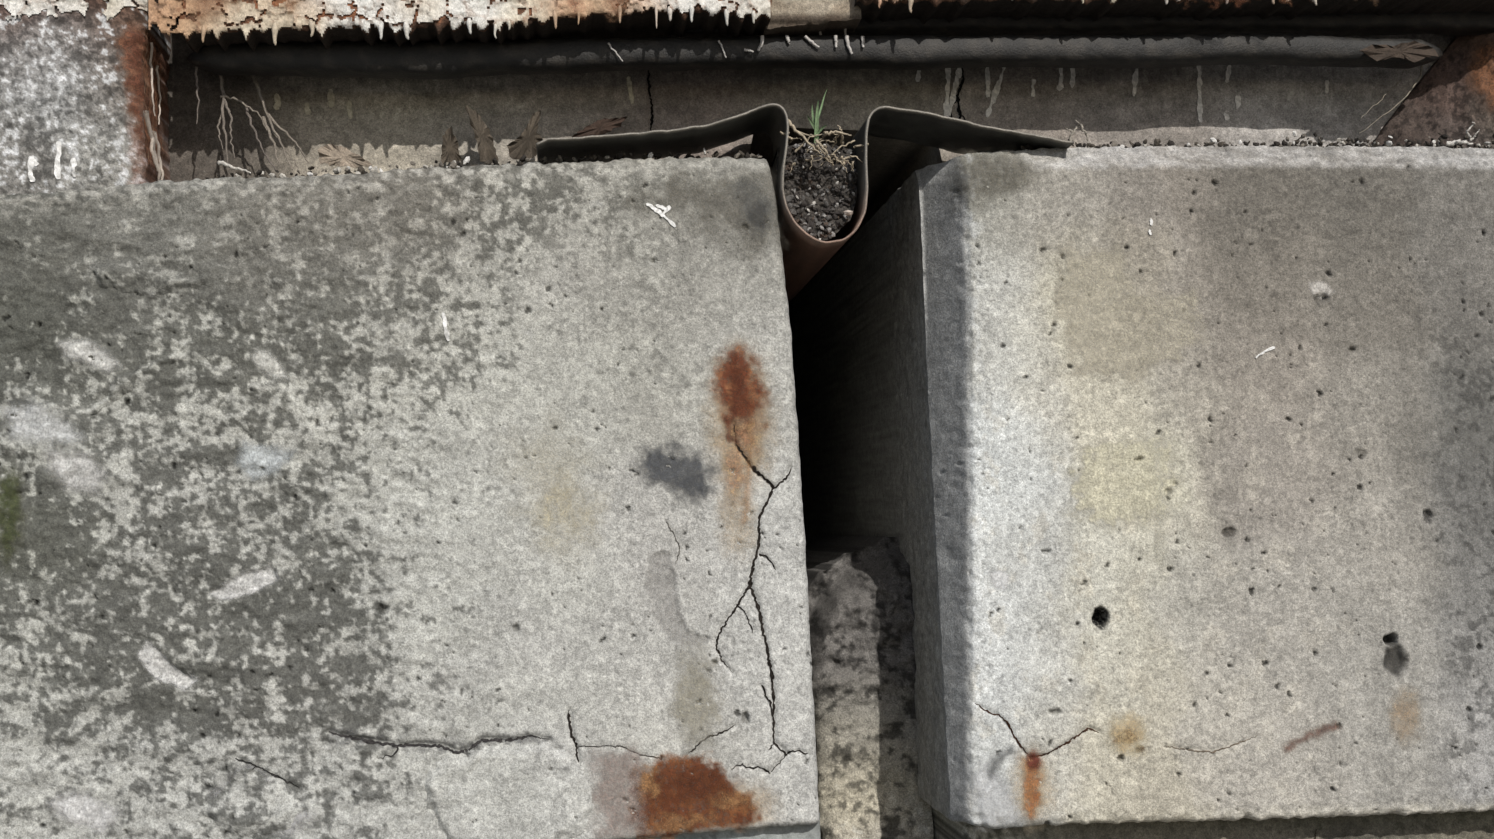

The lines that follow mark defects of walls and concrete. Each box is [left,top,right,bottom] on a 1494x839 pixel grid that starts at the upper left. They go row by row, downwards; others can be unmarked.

peeling [0,0,771,45]
peeling [878,0,914,13]
corrosion [115,24,166,175]
corrosion [1469,43,1494,110]
corrosion [714,345,768,495]
crack [329,424,808,774]
crack [975,703,1099,757]
corrosion [594,754,761,839]
corrosion [1023,752,1043,819]